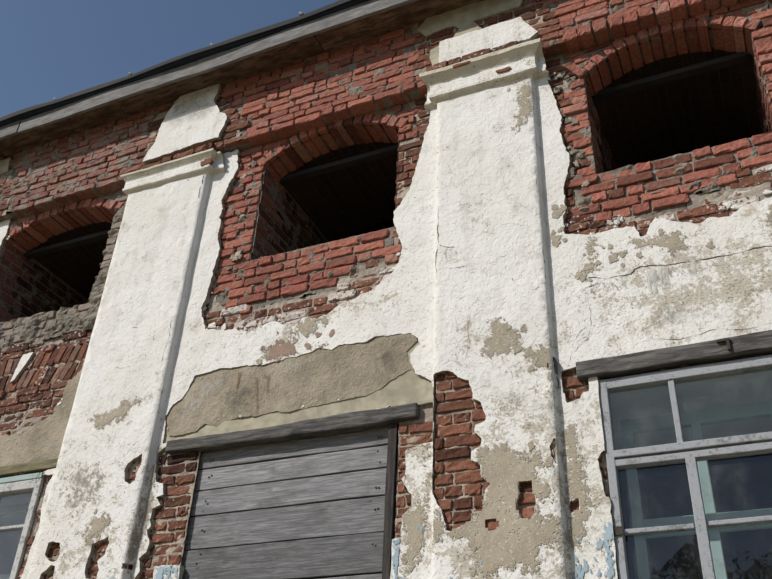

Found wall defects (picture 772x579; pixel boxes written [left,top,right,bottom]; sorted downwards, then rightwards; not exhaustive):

flaking render [395,97,430,210]
flaking render [545,54,772,295]
peeling [166,161,418,437]
crack [570,246,765,358]
flaking render [0,329,93,476]
peeling [87,396,146,429]
peeling [479,317,589,403]
flaking render [44,542,61,579]
peeling [82,509,111,579]
flaking render [125,446,202,579]
peeling [393,372,596,579]